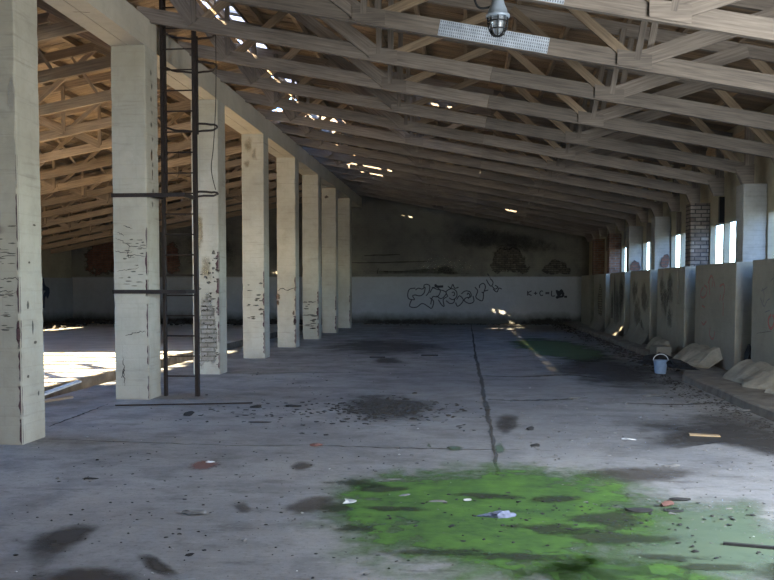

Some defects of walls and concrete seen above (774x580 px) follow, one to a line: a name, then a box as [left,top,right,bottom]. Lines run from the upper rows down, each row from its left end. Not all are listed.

spalling [0,281,29,444]
spalling [0,185,30,270]
flaking render [84,228,149,336]
flaking render [199,250,220,369]
crack [322,443,447,451]
flaking render [490,247,530,274]
crack [471,325,589,471]